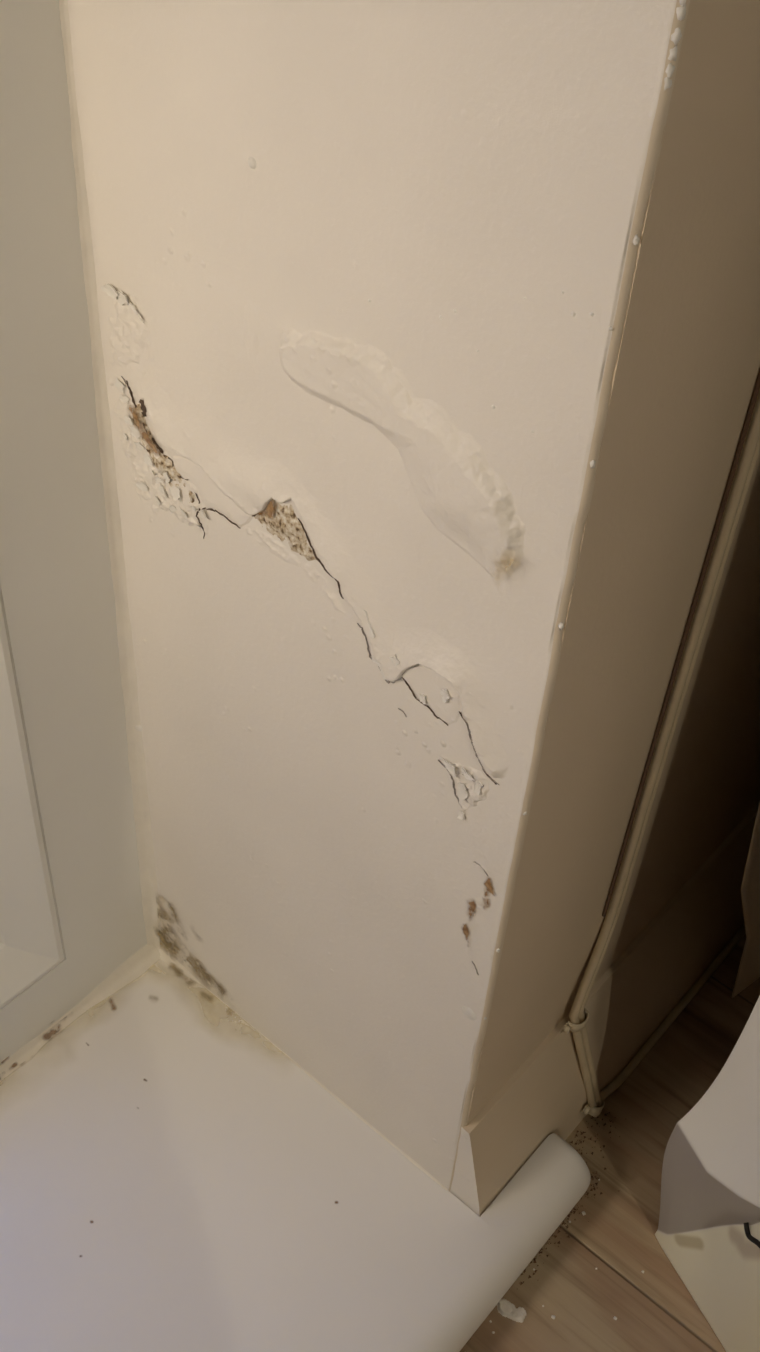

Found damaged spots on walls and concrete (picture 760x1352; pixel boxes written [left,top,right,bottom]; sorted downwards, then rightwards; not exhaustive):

crack [121,376,258,539]
peeling [109,359,522,820]
crack [298,518,499,785]
water stain [157,906,223,991]